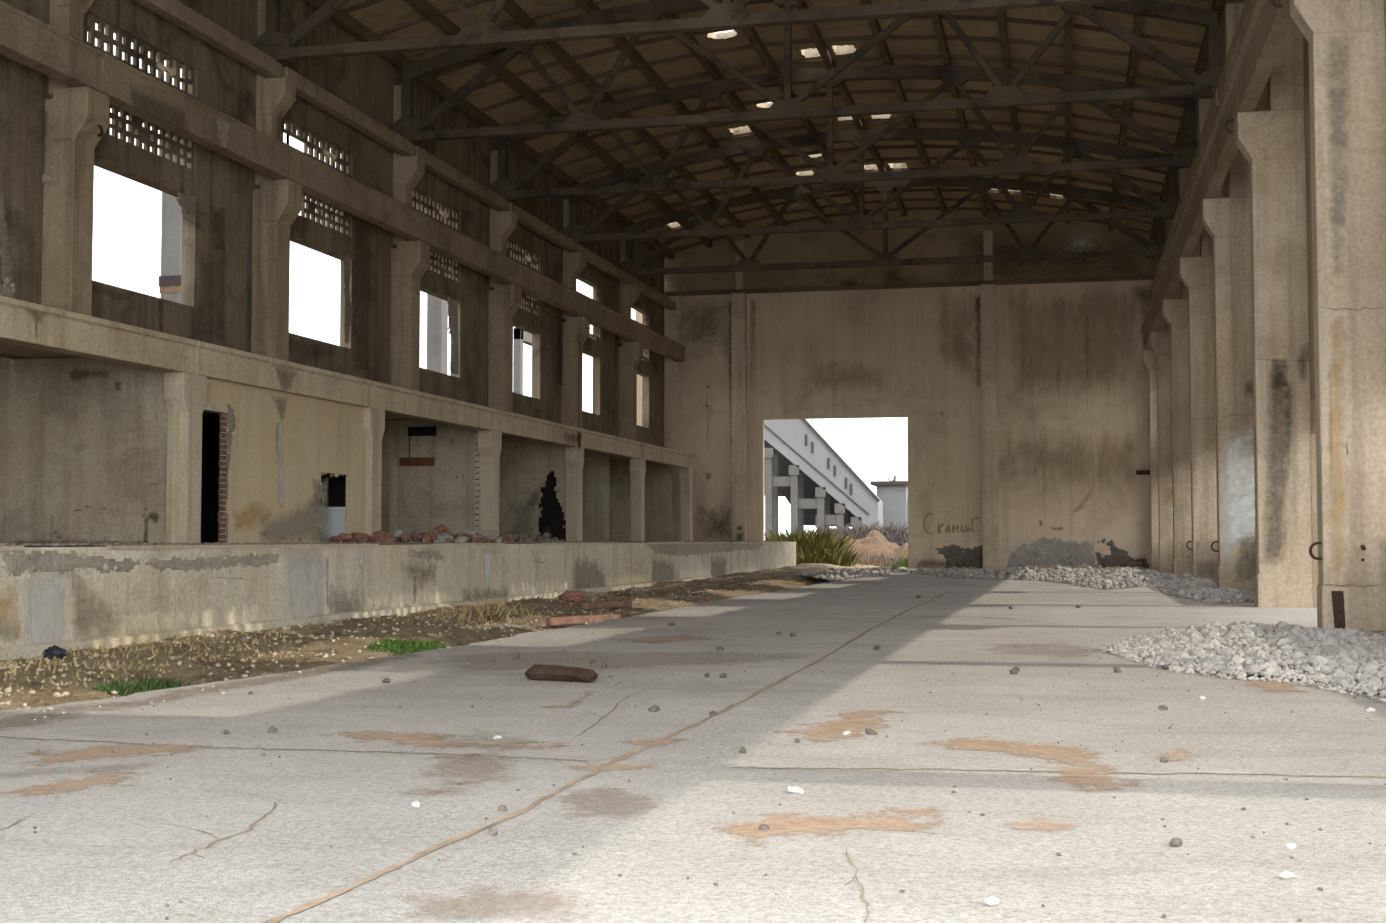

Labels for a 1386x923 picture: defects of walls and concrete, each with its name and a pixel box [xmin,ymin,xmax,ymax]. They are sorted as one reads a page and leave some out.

crack [571,691,641,739]